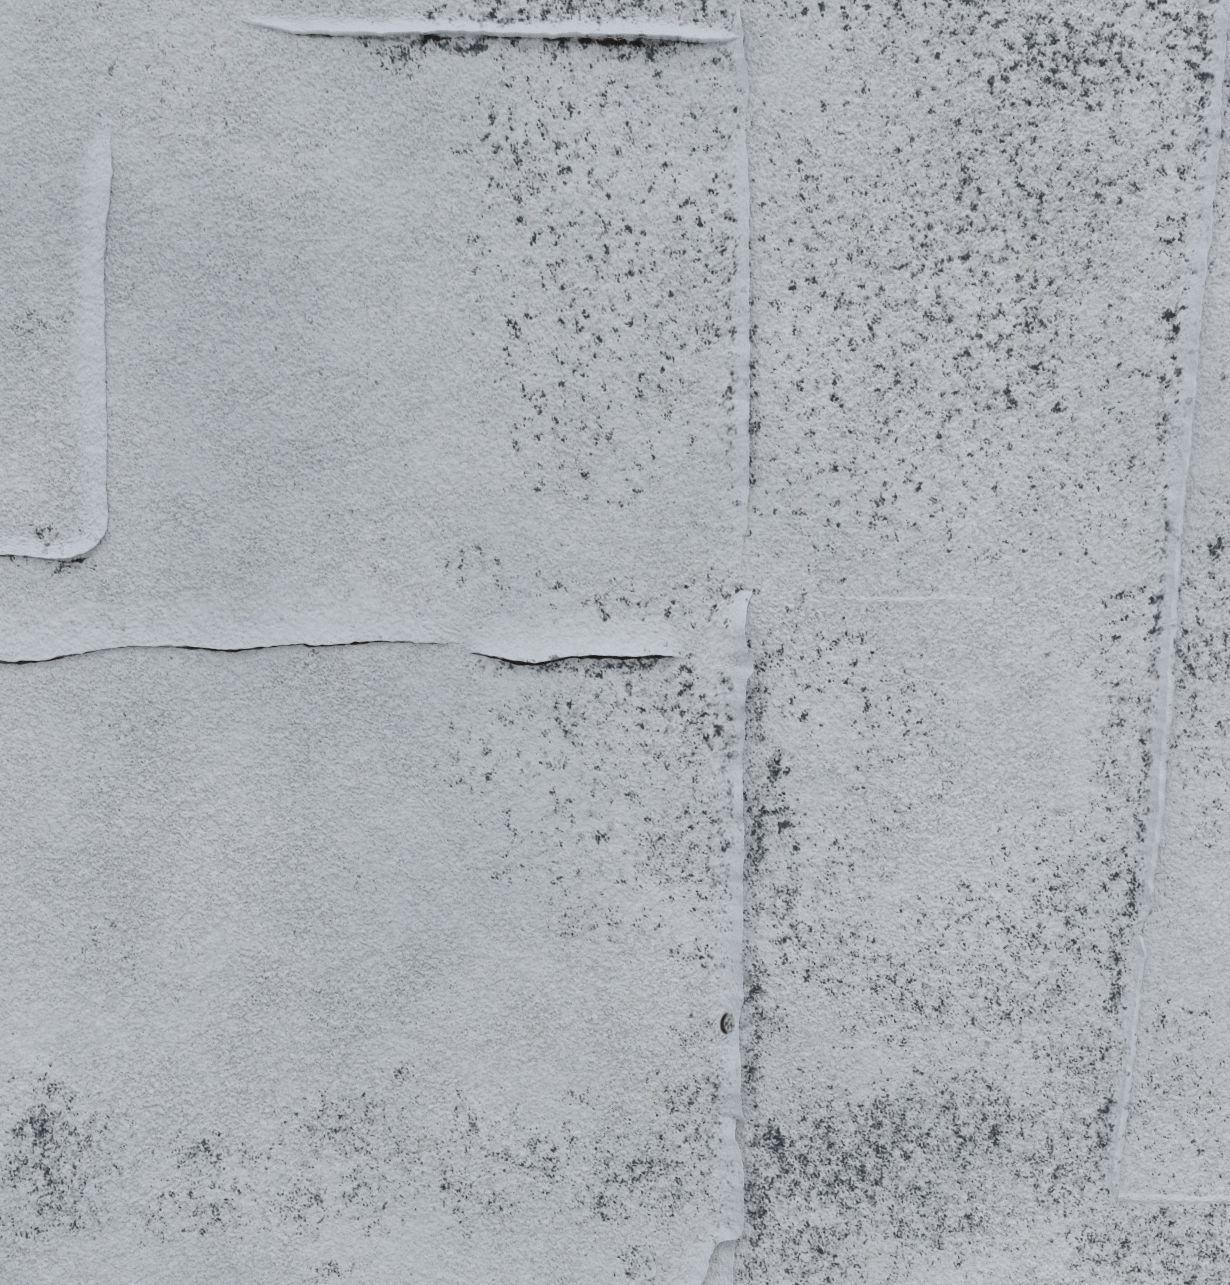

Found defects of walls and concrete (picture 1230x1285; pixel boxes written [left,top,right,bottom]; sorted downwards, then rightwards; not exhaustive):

water stain [364,39,529,87]
water stain [470,0,727,28]
water stain [472,97,611,223]
water stain [530,199,764,389]
water stain [778,0,1230,538]
crack [0,575,681,666]
water stain [531,655,732,790]
water stain [745,617,847,741]
water stain [1105,581,1163,677]
water stain [1171,537,1230,824]
water stain [731,718,1230,1285]
water stain [572,1075,721,1233]